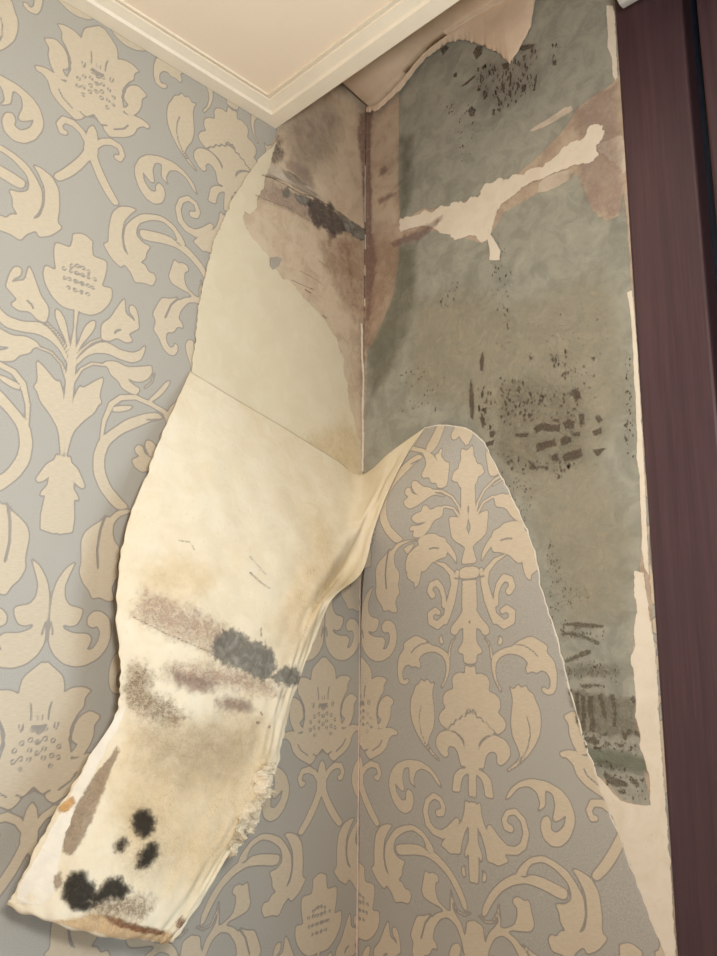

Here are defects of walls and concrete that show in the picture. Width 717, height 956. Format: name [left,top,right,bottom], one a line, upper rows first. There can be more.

damp [454,44,537,114]
damp [266,111,389,316]
flaking render [243,0,654,806]
damp [469,331,604,521]
damp [124,666,185,723]
damp [141,593,301,690]
damp [547,541,647,800]
damp [117,809,158,869]
damp [62,871,130,911]